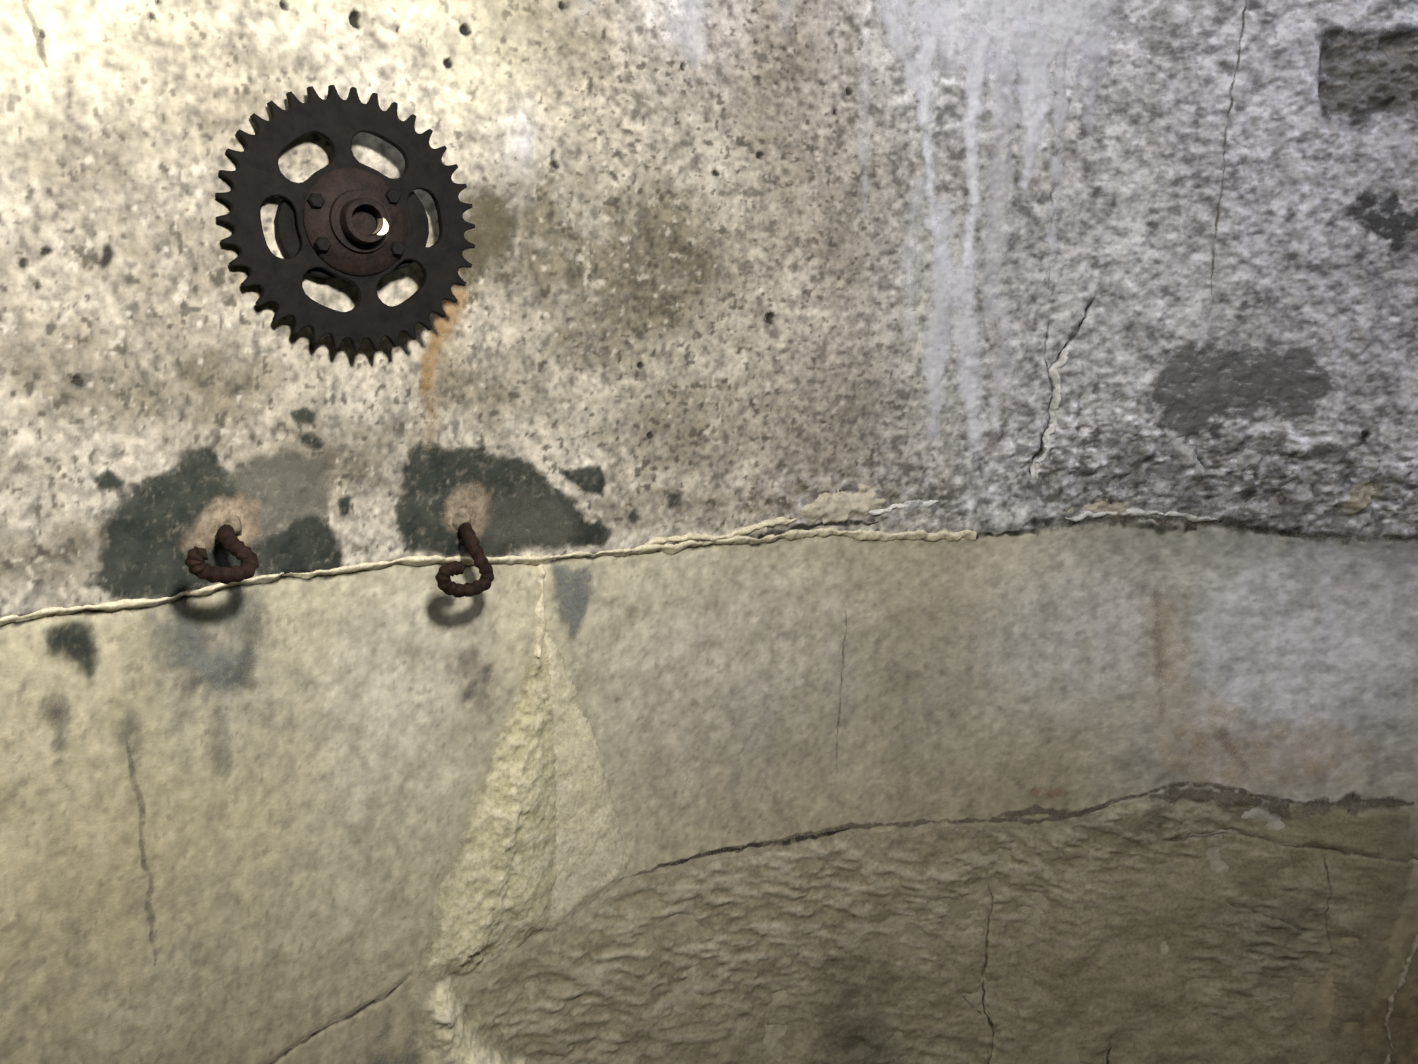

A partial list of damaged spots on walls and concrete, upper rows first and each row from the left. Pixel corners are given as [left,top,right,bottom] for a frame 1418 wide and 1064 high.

spalling [1318,24,1418,125]
water stain [879,0,1116,451]
crack [1029,297,1095,479]
corrosion [187,497,259,548]
crack [0,500,1418,627]
crack [142,851,153,935]
crack [635,782,1418,953]
crack [269,983,401,1064]
crack [977,885,994,1064]
crack [1383,934,1418,1064]